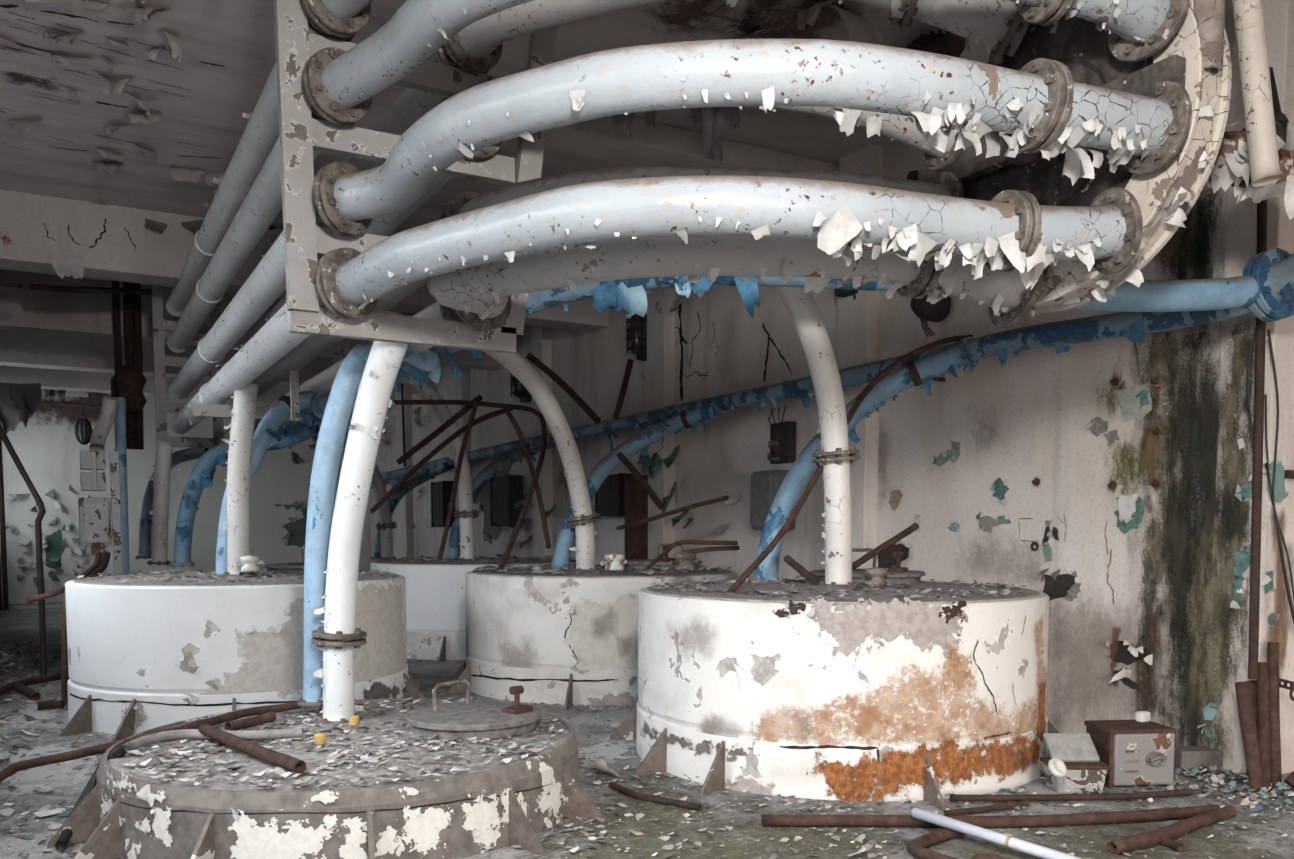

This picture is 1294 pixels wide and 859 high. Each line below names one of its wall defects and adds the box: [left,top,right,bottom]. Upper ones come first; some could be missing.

peeling [832,91,1150,186]
peeling [562,263,766,319]
peeling [782,204,1103,317]
peeling [0,382,42,434]
spalling [1039,520,1081,602]
leakage [1136,342,1247,746]
crack [471,614,618,682]
peeling [772,595,969,657]
rust [753,619,1047,802]
crack [973,641,1017,739]
leakage [1110,628,1120,685]
crack [779,745,880,763]